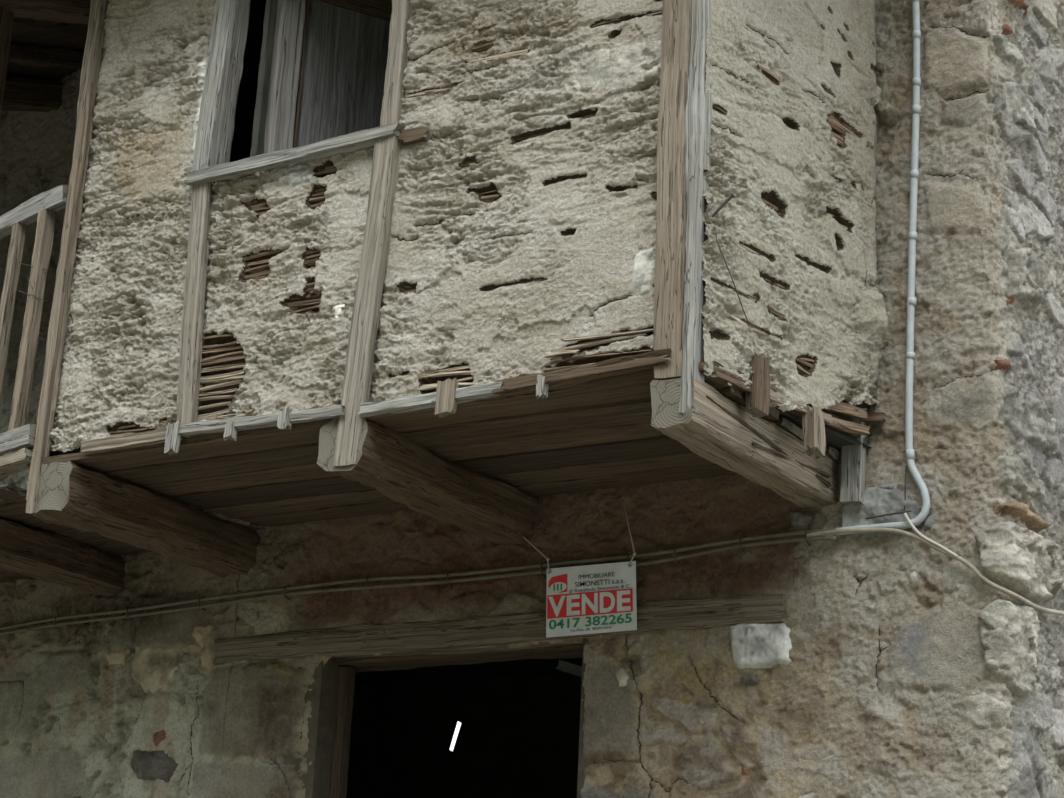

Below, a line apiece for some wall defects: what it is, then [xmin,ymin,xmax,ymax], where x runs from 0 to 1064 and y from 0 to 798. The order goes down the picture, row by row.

spalling [820,23,855,78]
spalling [827,112,863,149]
spalling [761,190,788,219]
spalling [237,248,289,282]
spalling [279,247,322,314]
spalling [197,331,256,422]
spalling [387,362,475,394]
spalling [540,326,654,373]
spalling [795,354,818,377]
crack [586,635,689,797]